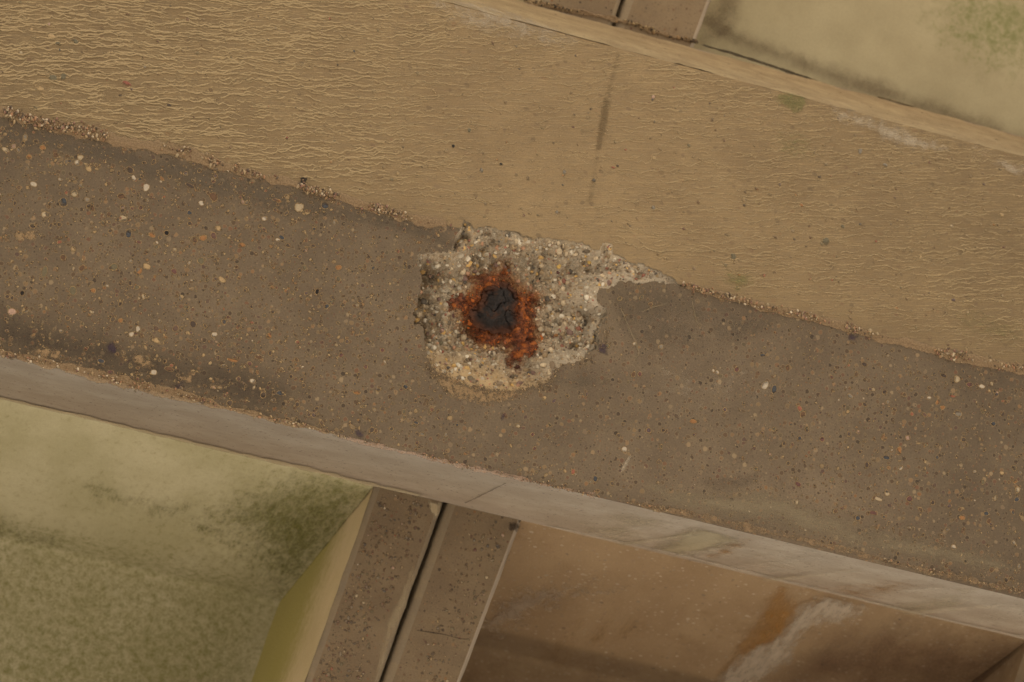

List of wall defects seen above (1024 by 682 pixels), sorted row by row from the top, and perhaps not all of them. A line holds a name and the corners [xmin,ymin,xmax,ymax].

rust [448,262,540,373]
spalling [0,105,1024,593]
water stain [723,592,861,682]